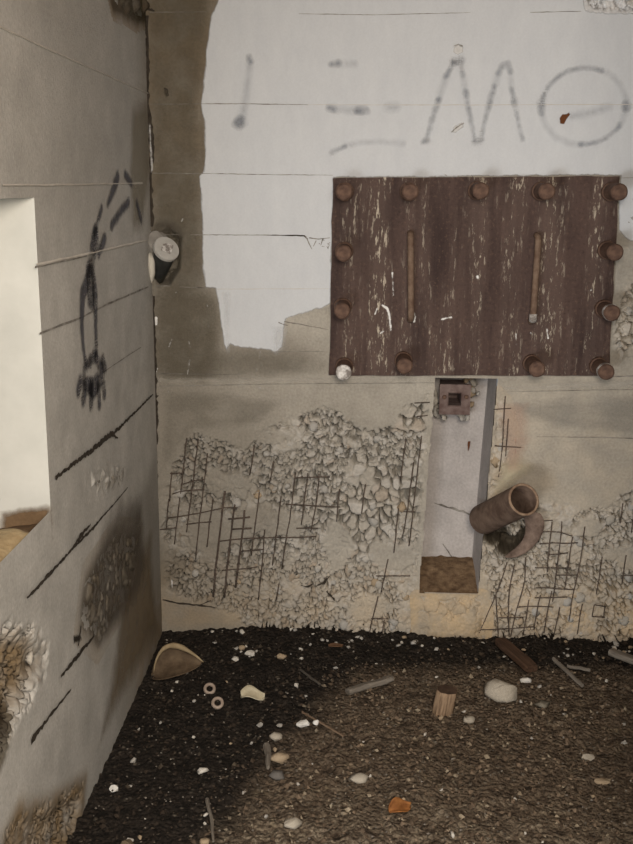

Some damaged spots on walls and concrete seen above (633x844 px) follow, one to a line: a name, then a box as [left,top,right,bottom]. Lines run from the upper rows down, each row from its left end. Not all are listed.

spalling [583,0,633,14]
spalling [490,396,521,477]
spalling [160,438,340,600]
spalling [309,436,424,649]
spalling [476,520,586,644]
spalling [0,592,56,781]
spalling [0,764,90,844]